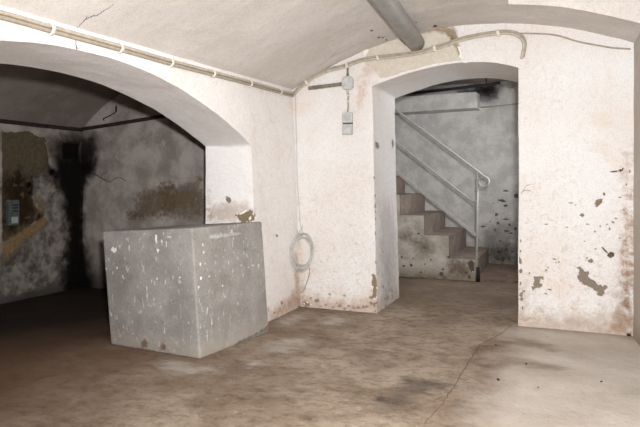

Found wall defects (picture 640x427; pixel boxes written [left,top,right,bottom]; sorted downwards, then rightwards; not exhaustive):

peeling [1,131,50,242]
leakage [0,137,97,295]
spalling [235,210,256,222]
spalling [577,267,607,296]
crack [425,325,512,423]